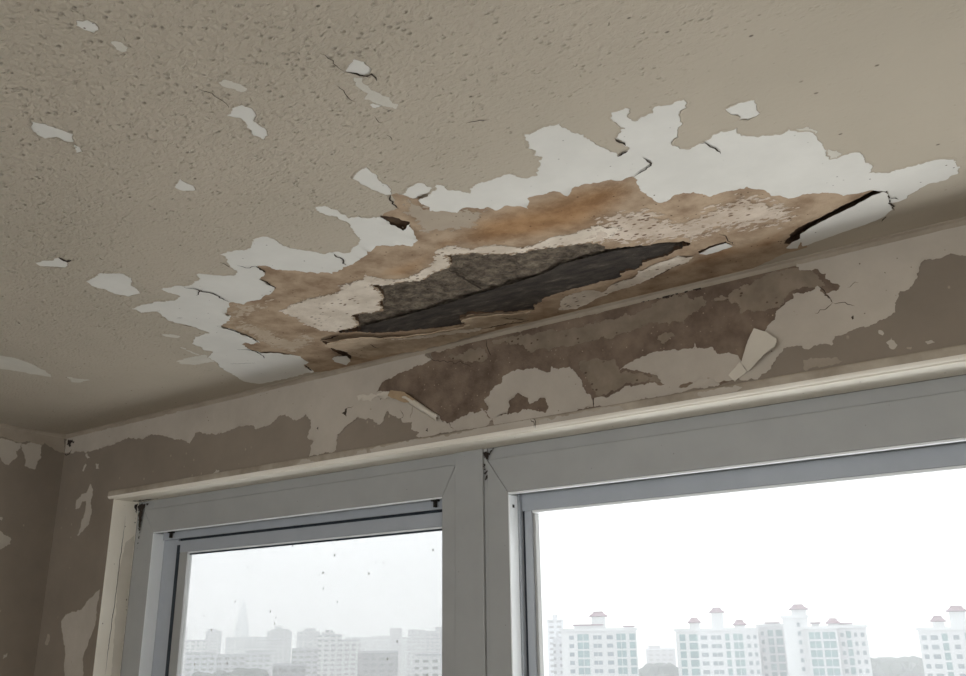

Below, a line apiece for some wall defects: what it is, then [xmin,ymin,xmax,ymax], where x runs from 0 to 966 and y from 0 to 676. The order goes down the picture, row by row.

peeling [218,80,270,141]
peeling [343,58,398,109]
peeling [0,97,966,471]
leakage [377,266,839,423]
peeling [76,484,93,536]
peeling [61,590,100,676]